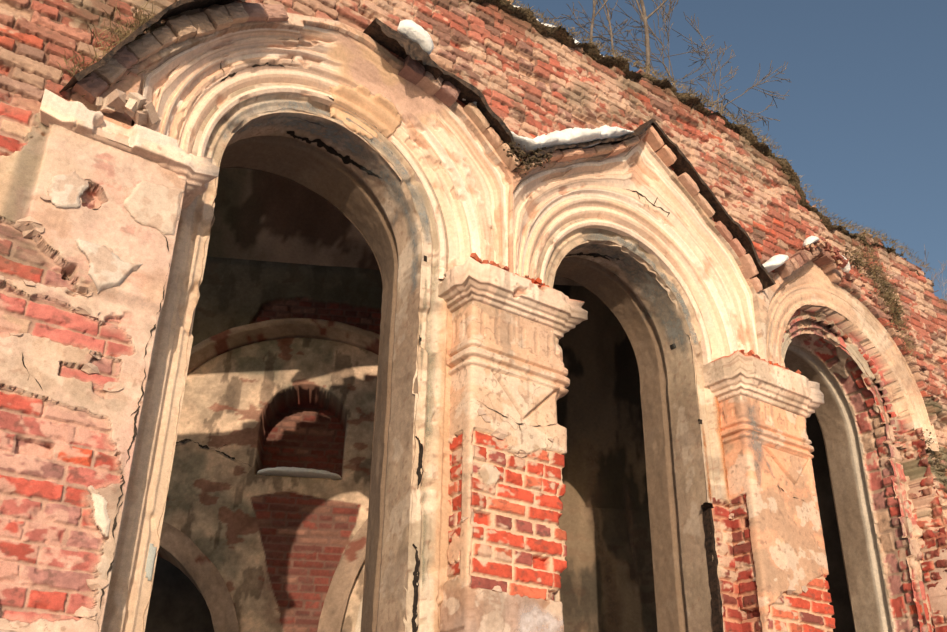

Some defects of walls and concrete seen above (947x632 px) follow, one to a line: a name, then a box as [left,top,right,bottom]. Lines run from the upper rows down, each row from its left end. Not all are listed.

spalling [0,216,143,392]
spalling [0,384,123,623]